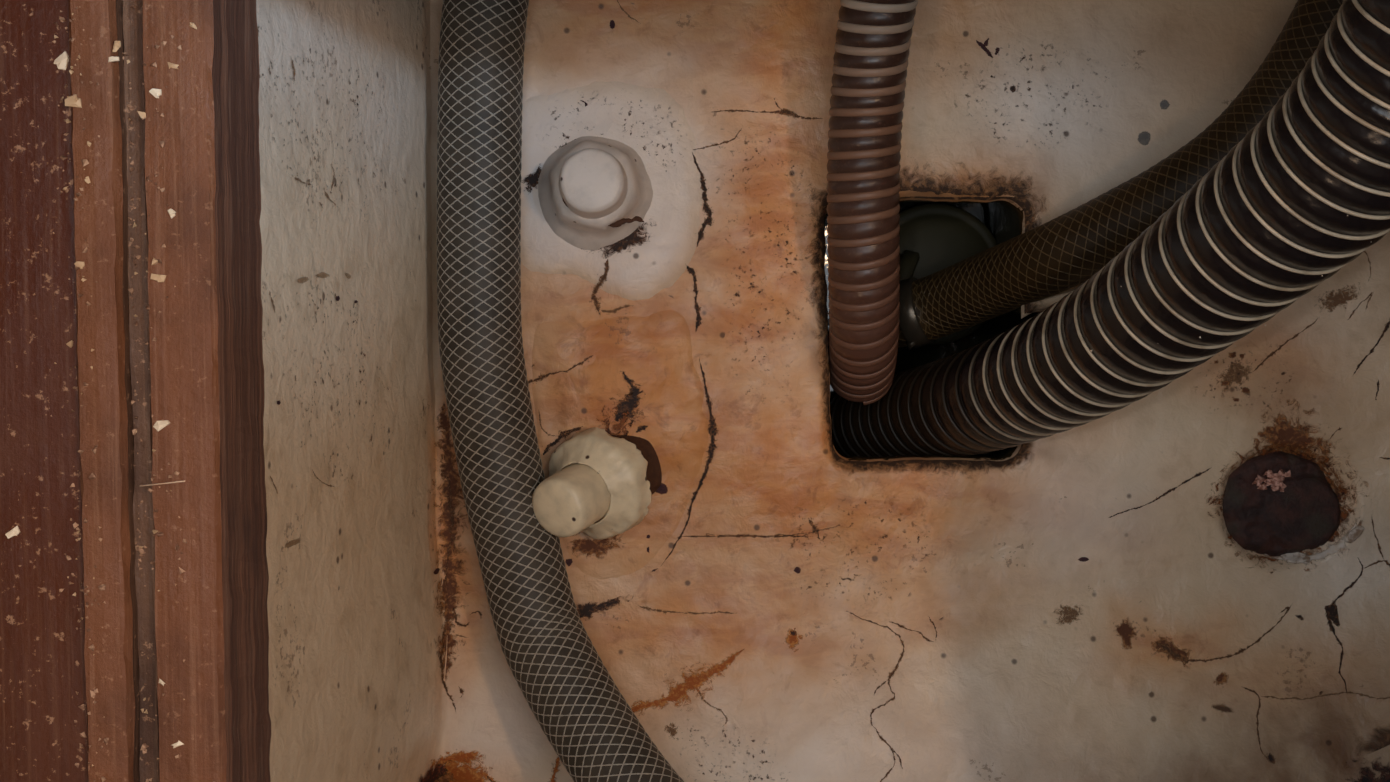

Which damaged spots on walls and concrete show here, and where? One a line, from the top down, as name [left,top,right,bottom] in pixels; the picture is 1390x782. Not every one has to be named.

corrosion [522,166,542,193]
corrosion [591,223,655,314]
crack [652,98,838,572]
crack [1254,251,1390,400]
corrosion [542,371,648,455]
corrosion [1207,399,1362,573]
corrosion [566,533,621,566]
crack [1157,519,1390,764]
corrosion [631,649,744,736]
crack [847,611,937,782]
corrosion [419,751,495,782]
damp [1347,729,1390,782]